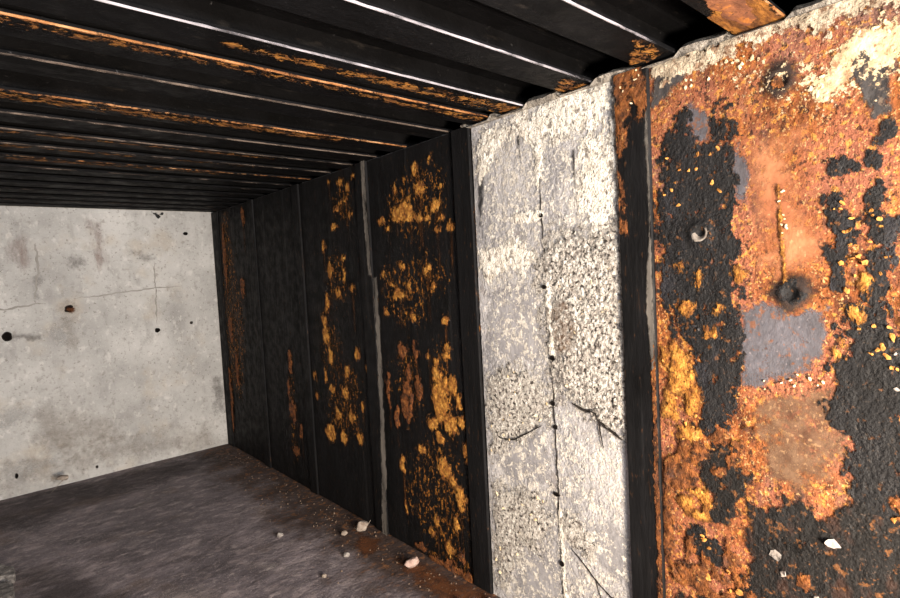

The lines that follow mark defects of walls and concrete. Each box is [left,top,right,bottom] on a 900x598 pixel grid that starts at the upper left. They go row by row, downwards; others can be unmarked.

water stain [650,0,900,119]
corrosion [754,131,823,283]
corrosion [313,239,367,447]
corrosion [376,151,490,598]
crack [498,178,625,598]
corrosion [677,298,697,319]
corrosion [673,261,703,288]
corrosion [702,303,726,340]
corrosion [838,254,876,325]
corrosion [650,338,757,598]
corrosion [883,495,900,524]
corrosion [796,572,811,594]